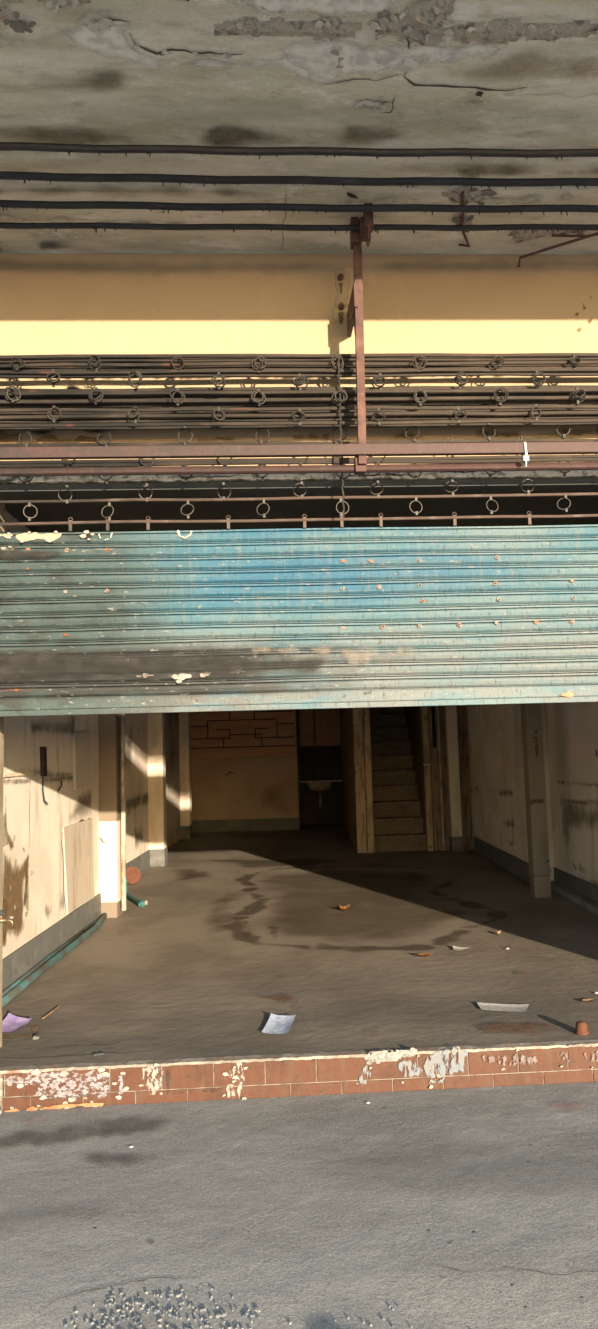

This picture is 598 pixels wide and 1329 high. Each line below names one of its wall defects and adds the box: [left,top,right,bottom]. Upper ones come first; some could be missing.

spalling [0,6,36,33]
spalling [214,0,598,47]
spalling [508,230,598,267]
leakage [3,841,29,945]
peeling [0,1063,164,1112]
peeling [222,1062,248,1100]
peeling [356,1046,537,1089]